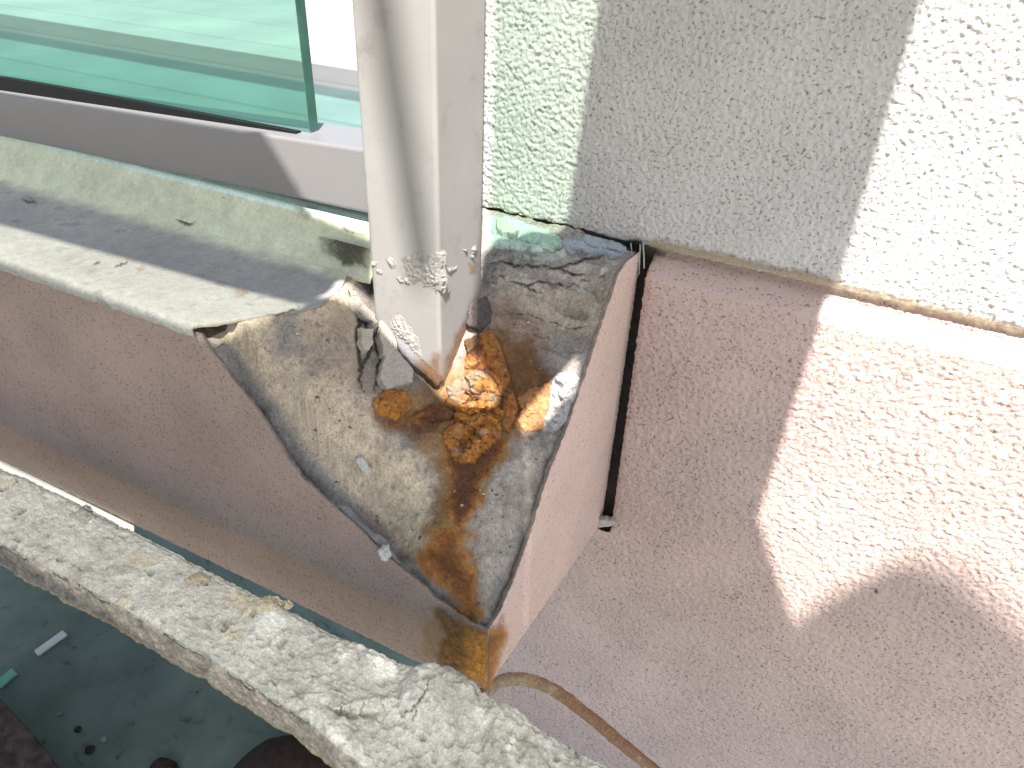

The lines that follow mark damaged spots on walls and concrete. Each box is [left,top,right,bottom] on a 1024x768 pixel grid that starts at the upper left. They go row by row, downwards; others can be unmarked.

crack [348,290,381,388]
spalling [194,208,636,627]
rust [387,324,547,689]